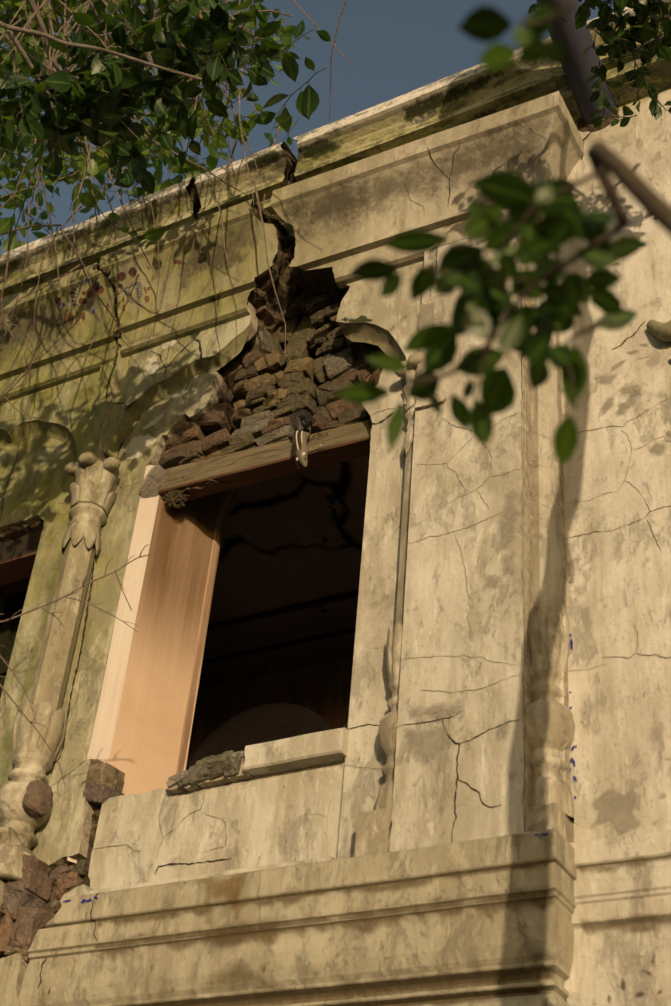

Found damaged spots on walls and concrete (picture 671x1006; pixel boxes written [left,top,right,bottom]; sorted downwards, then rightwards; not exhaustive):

crack [98,265,202,457]
spalling [124,201,385,503]
crack [218,408,394,562]
crack [564,399,670,553]
crack [345,360,553,843]
crack [571,625,670,671]
crack [96,794,232,875]
spalling [166,750,254,794]